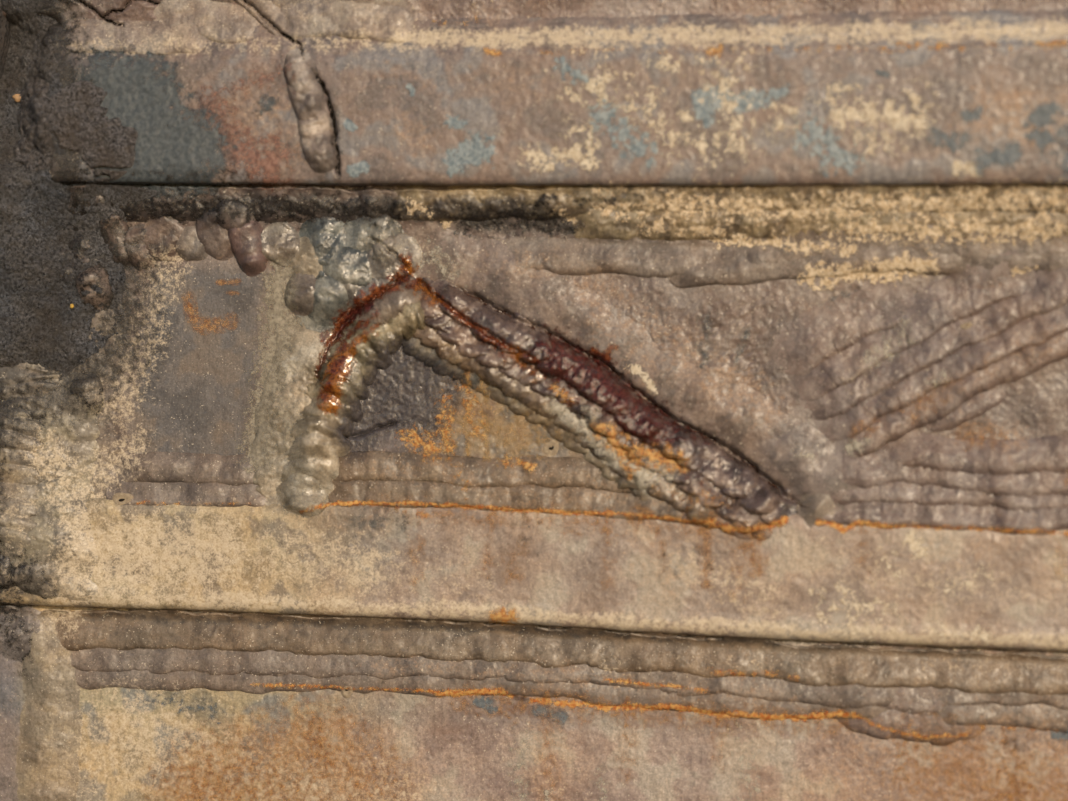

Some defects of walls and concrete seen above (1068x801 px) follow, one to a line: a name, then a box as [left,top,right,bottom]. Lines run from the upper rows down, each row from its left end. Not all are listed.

crack [76,0,161,27]
rust [195,59,299,191]
crack [243,0,340,180]
peeling [346,161,370,178]
peeling [441,114,496,178]
peeling [516,36,1068,187]
rust [299,254,788,587]
rust [815,520,1068,535]
rust [251,683,399,692]
rust [413,687,969,748]